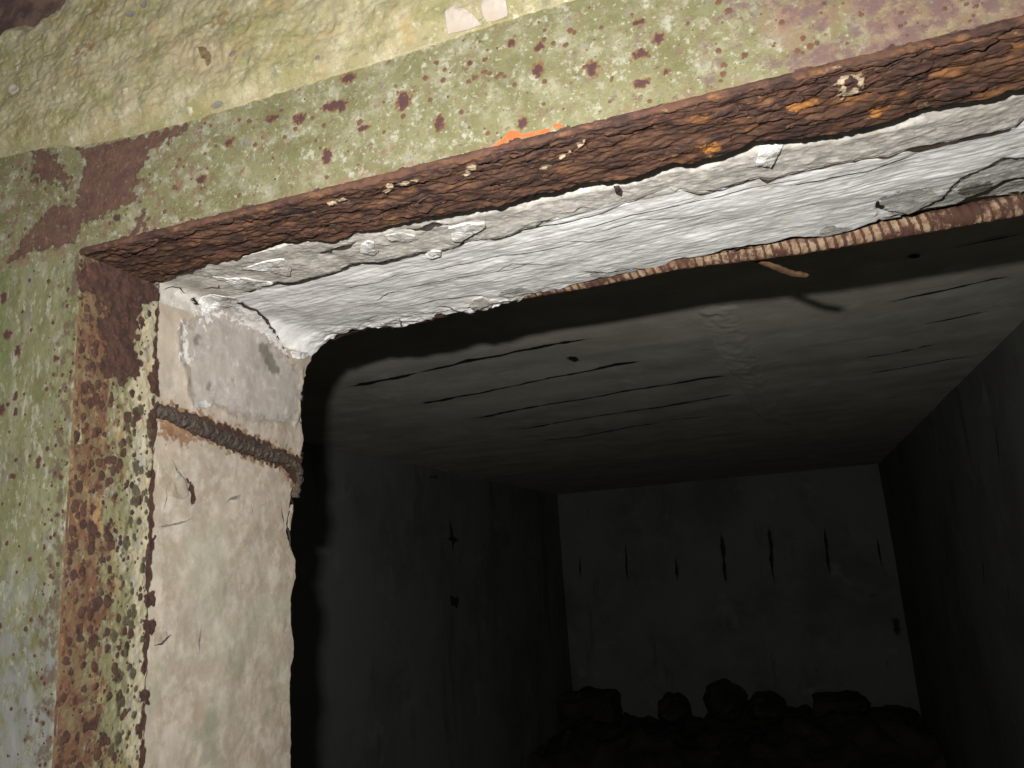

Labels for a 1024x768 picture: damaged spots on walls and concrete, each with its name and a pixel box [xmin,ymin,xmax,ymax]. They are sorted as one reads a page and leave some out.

flaking render [445,0,508,34]
rust [532,21,576,84]
rust [630,13,664,60]
rust [675,0,1013,129]
rust [383,85,415,119]
flaking render [755,140,784,168]
flaking render [448,221,486,242]
spalling [496,157,1024,304]
crack [354,339,585,386]
crack [866,311,986,373]
crack [424,361,728,441]
rust [0,98,664,768]